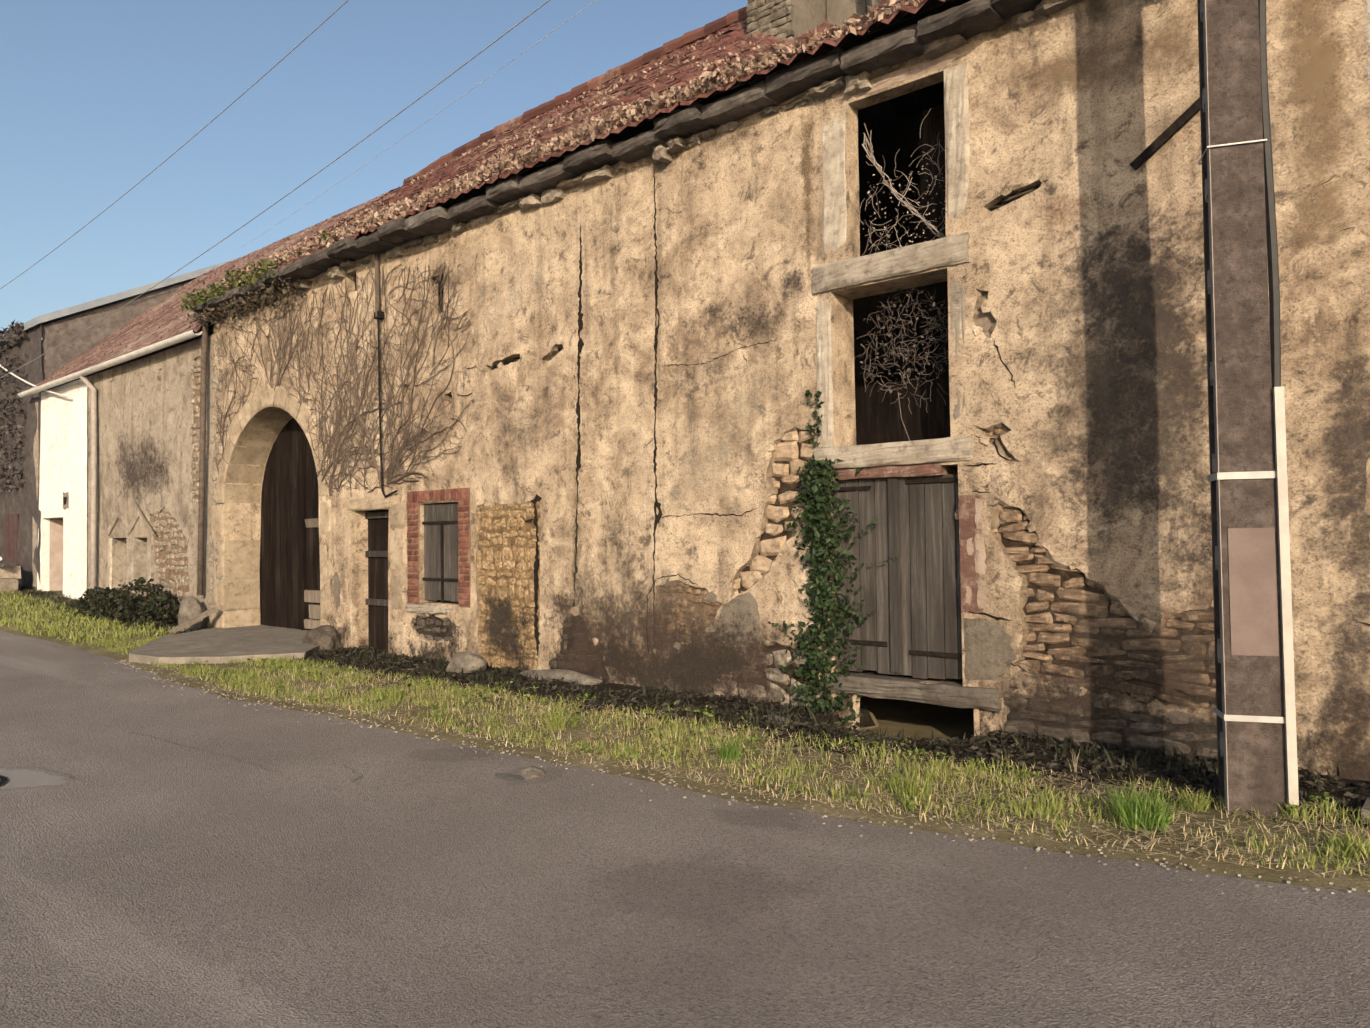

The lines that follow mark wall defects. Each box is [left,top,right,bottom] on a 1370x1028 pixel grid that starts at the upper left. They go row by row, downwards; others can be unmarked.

crack [525,224,586,656]
crack [646,161,776,654]
spalling [652,427,816,655]
spalling [955,497,1218,760]
leakage [1049,212,1212,595]